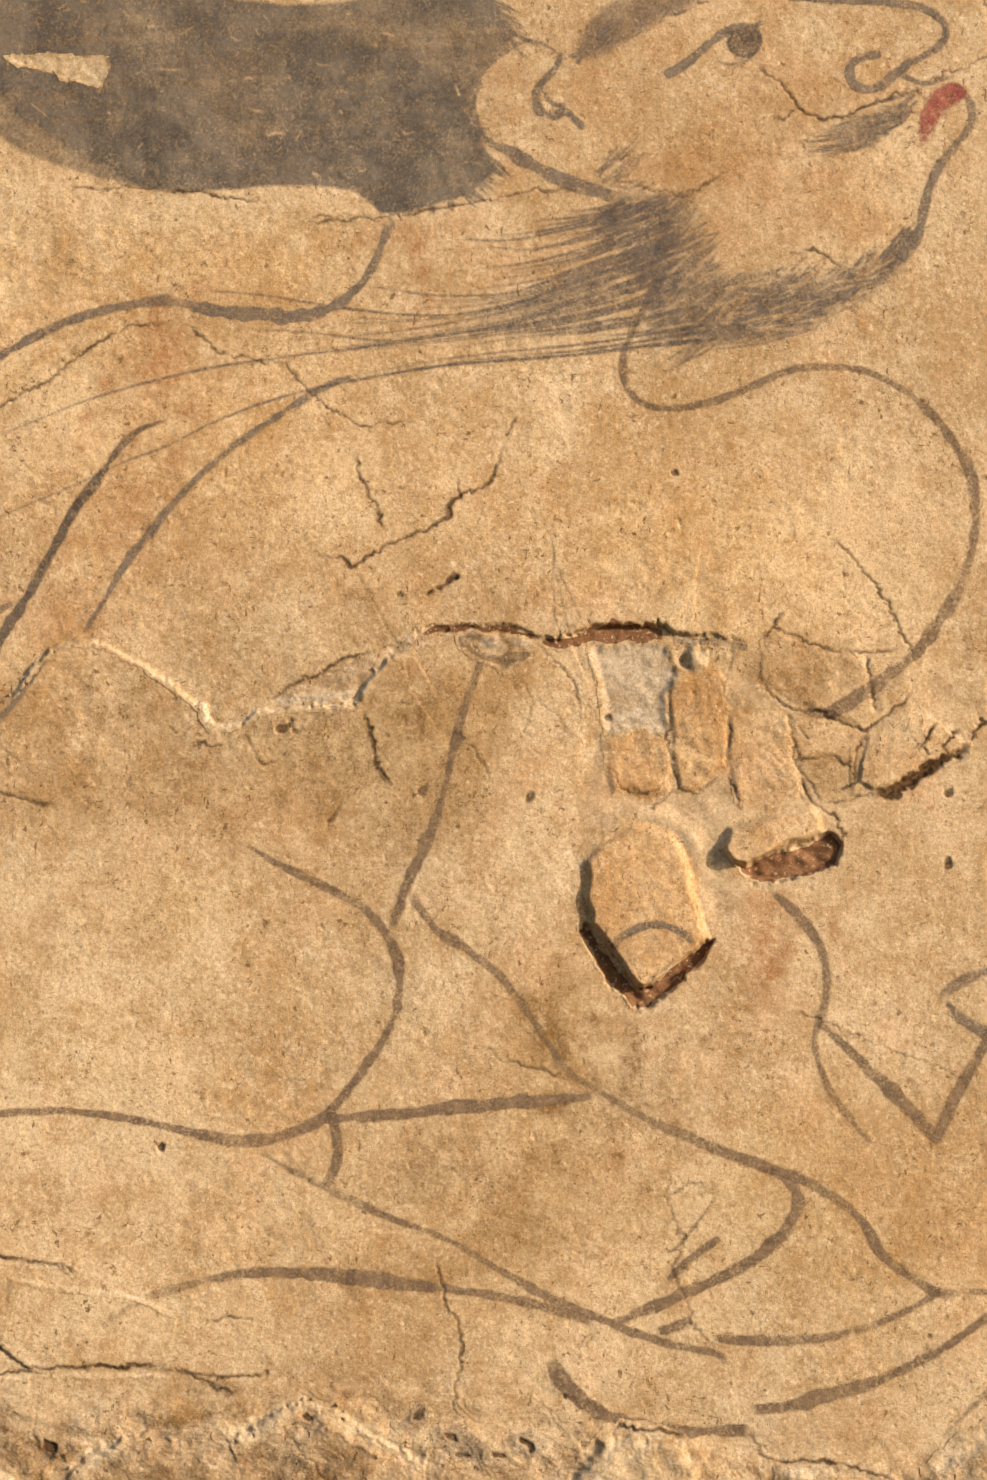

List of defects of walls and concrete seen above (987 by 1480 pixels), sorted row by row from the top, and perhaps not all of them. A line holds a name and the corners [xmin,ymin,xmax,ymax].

crack [7,325,142,402]
crack [193,330,515,569]
crack [767,543,987,837]
crack [363,717,387,781]
flaking render [0,1373,34,1383]
flaking render [52,1369,173,1381]
spalling [0,1388,678,1480]
spalling [773,1457,871,1480]
spalling [920,1416,987,1480]